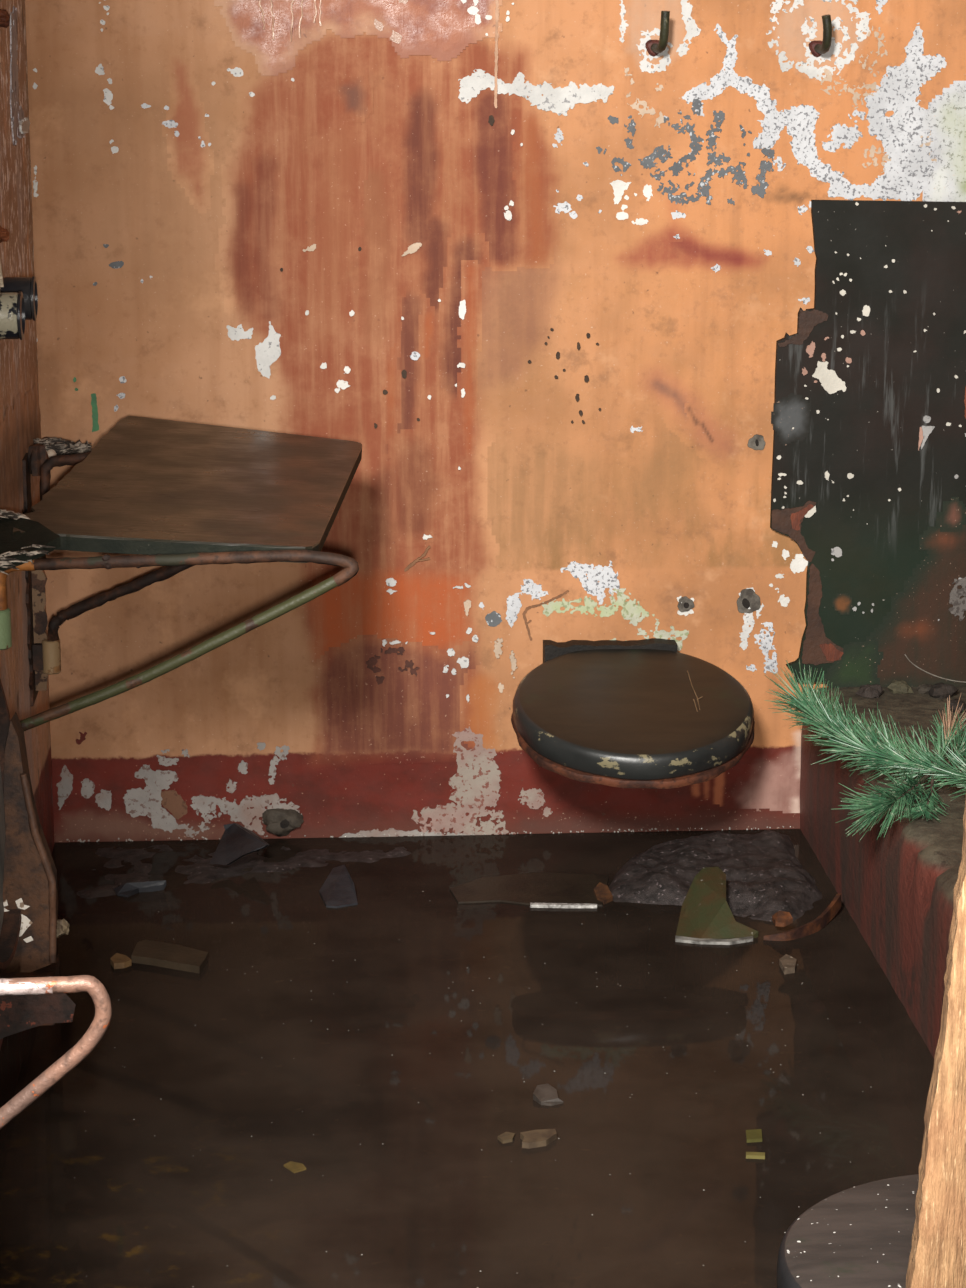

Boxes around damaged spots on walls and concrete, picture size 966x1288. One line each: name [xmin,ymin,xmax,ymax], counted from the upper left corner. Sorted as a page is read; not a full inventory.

peeling [458,0,961,239]
corrosion [609,187,779,279]
peeling [226,321,281,378]
peeling [335,366,351,393]
damp [214,0,749,775]
peeling [778,297,870,420]
peeling [918,375,966,451]
peeling [443,648,469,675]
peeling [453,561,694,693]
peeling [56,742,302,837]
peeling [339,726,516,838]
peeling [518,788,553,817]